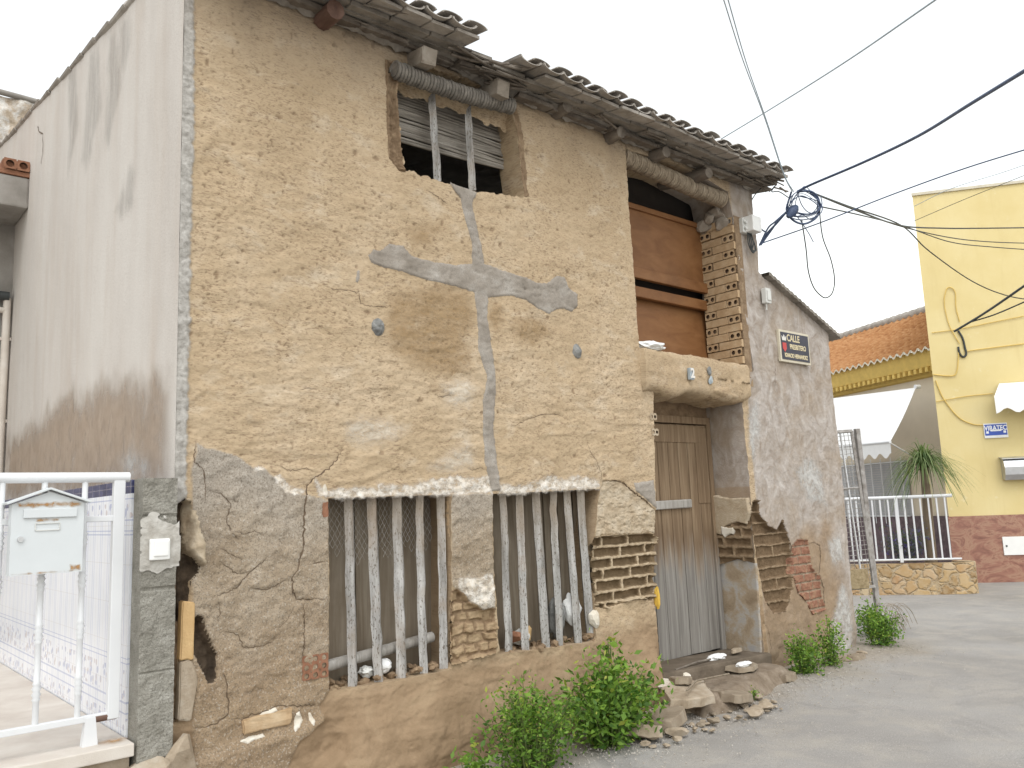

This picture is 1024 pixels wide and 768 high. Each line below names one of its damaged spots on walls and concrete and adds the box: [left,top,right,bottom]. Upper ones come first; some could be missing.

leakage [8,378,163,496]
peeling [254,467,304,496]
spalling [173,498,207,723]
spalling [193,615,217,683]
crack [201,669,312,728]
crack [193,439,338,654]
spalling [449,574,499,665]
spalling [315,475,659,609]
peeling [713,495,827,652]